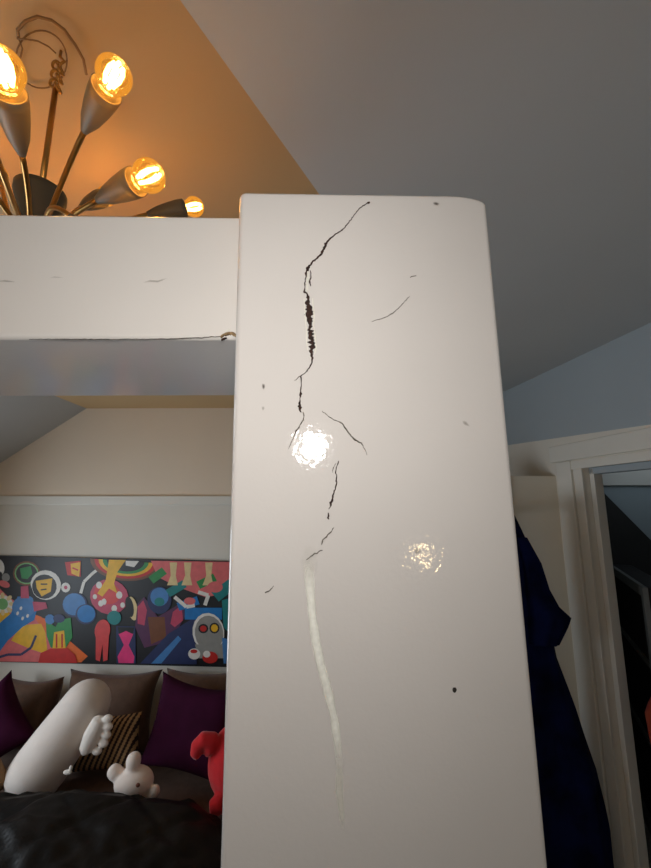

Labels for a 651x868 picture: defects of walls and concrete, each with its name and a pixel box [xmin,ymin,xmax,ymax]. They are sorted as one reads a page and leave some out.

crack [288,203,367,454]
crack [306,461,339,560]